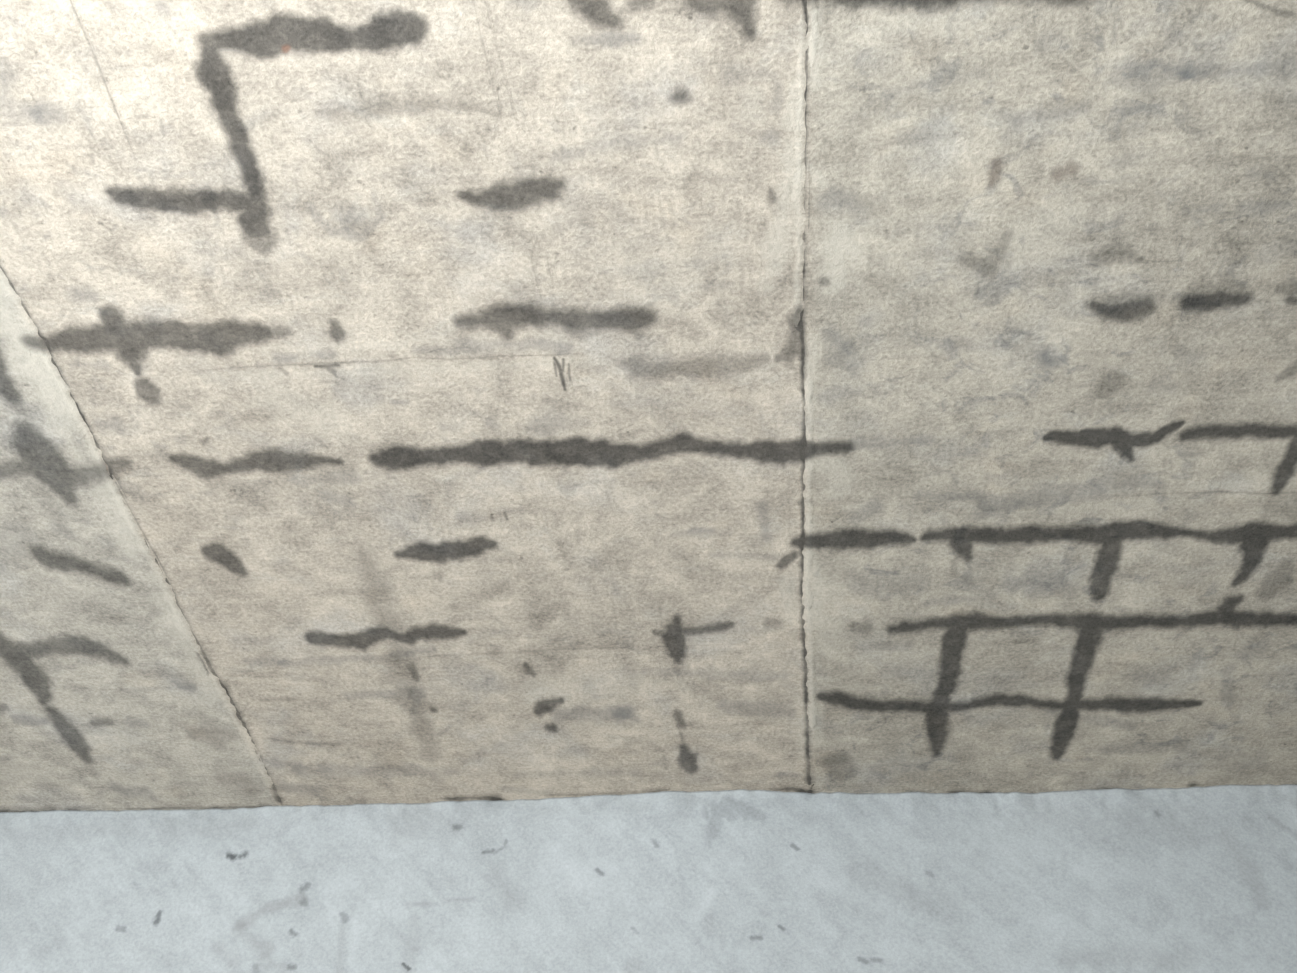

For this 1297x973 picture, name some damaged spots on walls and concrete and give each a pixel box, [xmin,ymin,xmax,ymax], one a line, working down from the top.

crack [69,0,158,168]
water stain [100,2,505,259]
water stain [561,0,1206,45]
water stain [0,297,298,592]
crack [0,256,349,812]
water stain [363,426,859,474]
water stain [447,295,809,389]
crack [765,0,821,793]
water stain [773,417,1297,764]
crack [438,790,510,801]
crack [544,787,670,797]
crack [942,786,997,794]